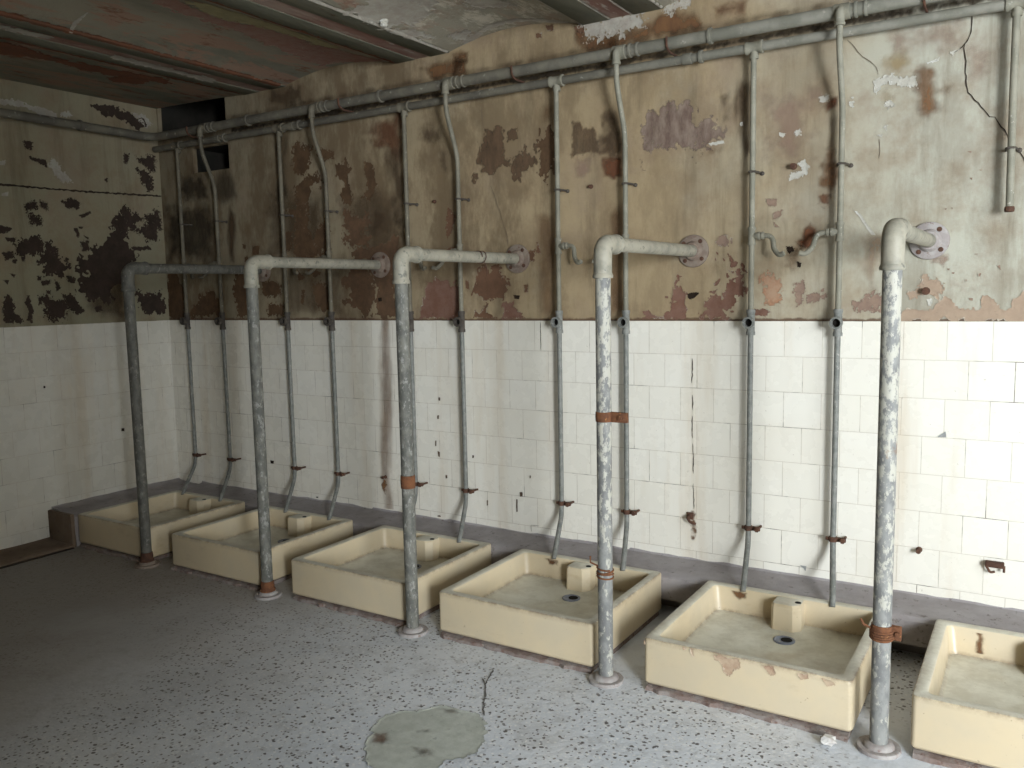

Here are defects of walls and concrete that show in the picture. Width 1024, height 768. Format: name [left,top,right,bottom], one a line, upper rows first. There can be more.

spalling [537,0,691,45]
crack [954,17,1024,159]
peeling [472,124,555,185]
peeling [641,100,727,158]
peeling [0,197,164,324]
leakage [169,176,235,261]
peeling [261,279,285,318]
peeling [285,141,399,320]
peeling [642,234,828,321]
peeling [851,289,882,313]
peeling [901,269,1024,321]
crack [482,670,494,716]